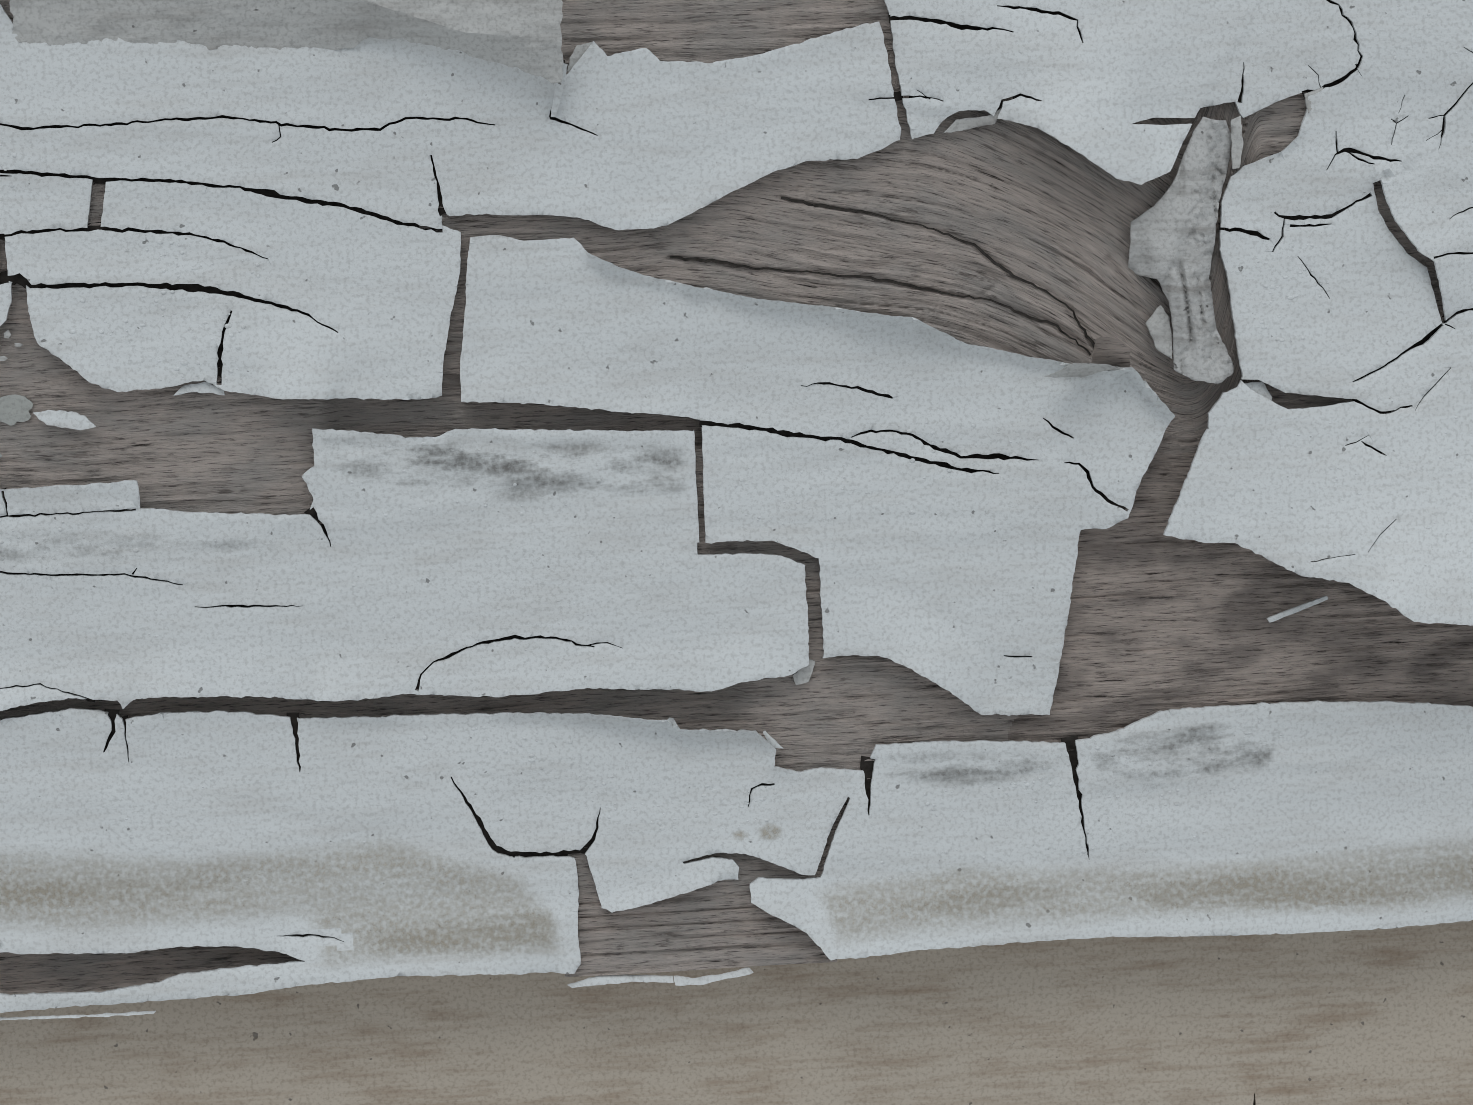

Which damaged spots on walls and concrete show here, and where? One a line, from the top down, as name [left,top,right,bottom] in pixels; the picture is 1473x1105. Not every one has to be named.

peeling [0,0,14,22]
peeling [551,0,893,117]
crack [869,6,1082,115]
crack [0,115,495,143]
crack [0,155,467,383]
crack [670,197,1095,356]
crack [1219,140,1473,454]
peeling [0,87,1473,779]
crack [0,568,295,607]
crack [416,635,622,690]
crack [451,777,600,857]
peeling [565,797,849,977]